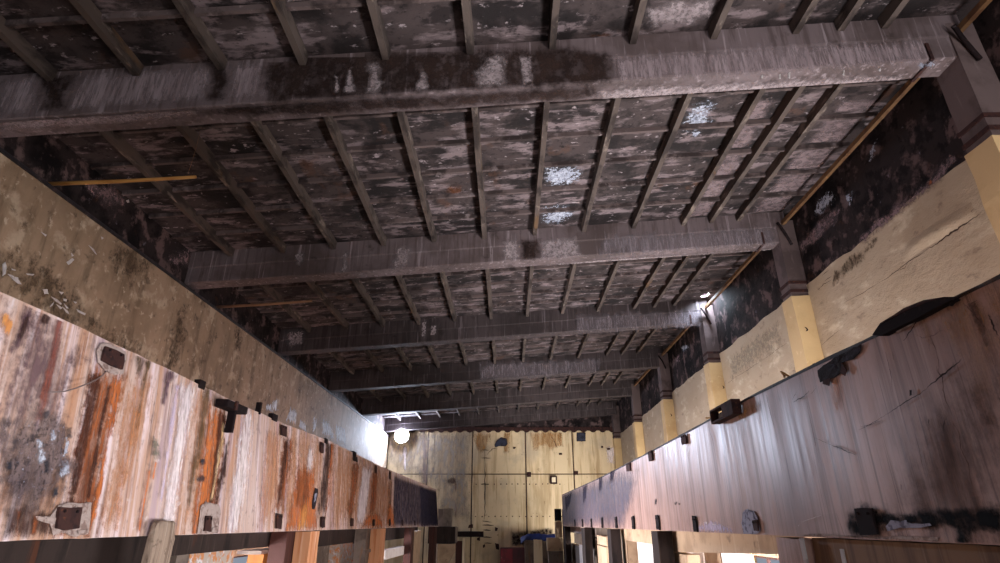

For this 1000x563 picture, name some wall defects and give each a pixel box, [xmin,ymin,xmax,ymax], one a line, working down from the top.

leakage [833,239,877,282]
crack [844,214,979,303]
rust [36,320,62,420]
rust [69,367,150,538]
rust [185,388,229,534]
rust [261,434,394,531]
crack [859,322,972,484]
leakage [915,395,990,515]